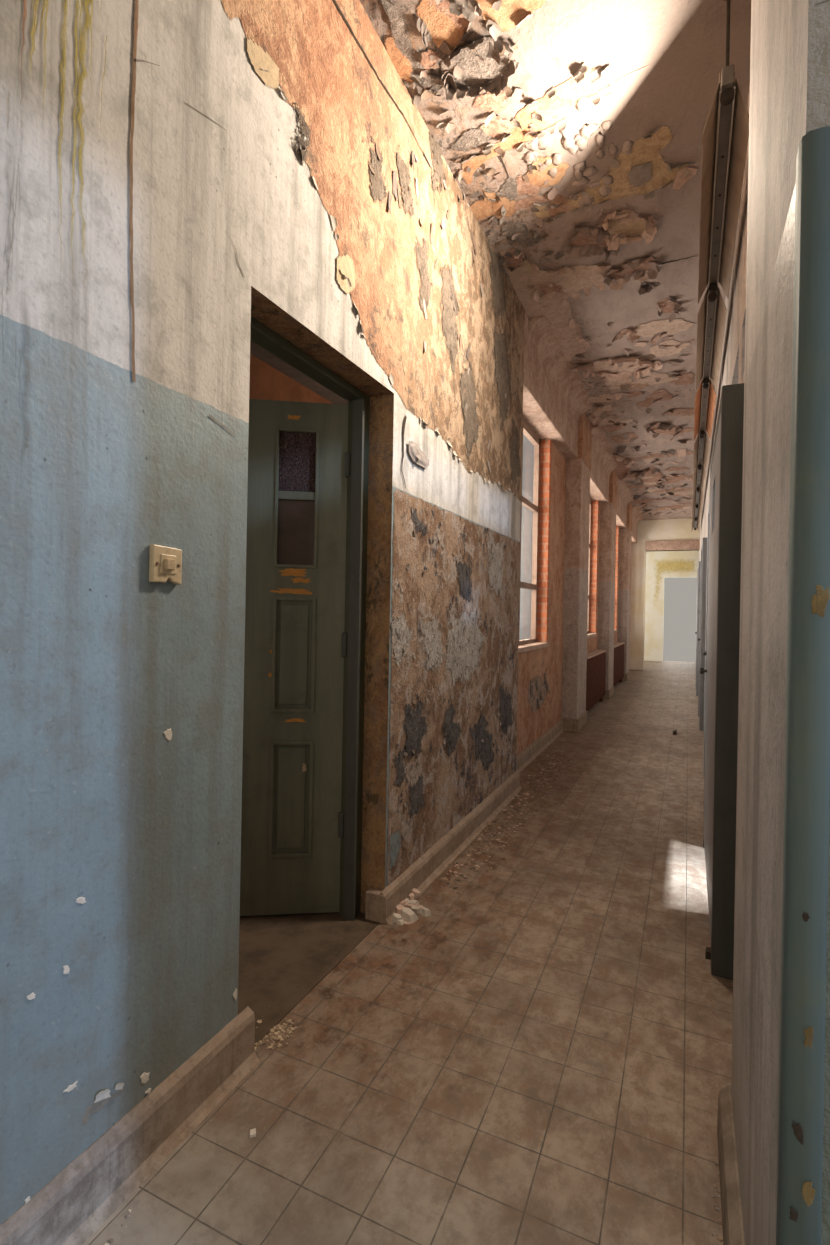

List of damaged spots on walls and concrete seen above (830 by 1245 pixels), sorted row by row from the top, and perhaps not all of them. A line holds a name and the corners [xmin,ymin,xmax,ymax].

damp [30,0,107,230]
peeling [221,0,698,515]
peeling [811,585,830,617]
peeling [387,489,550,885]
flaking render [81,1083,124,1125]
peeling [140,1072,151,1094]
peeling [790,1181,816,1222]